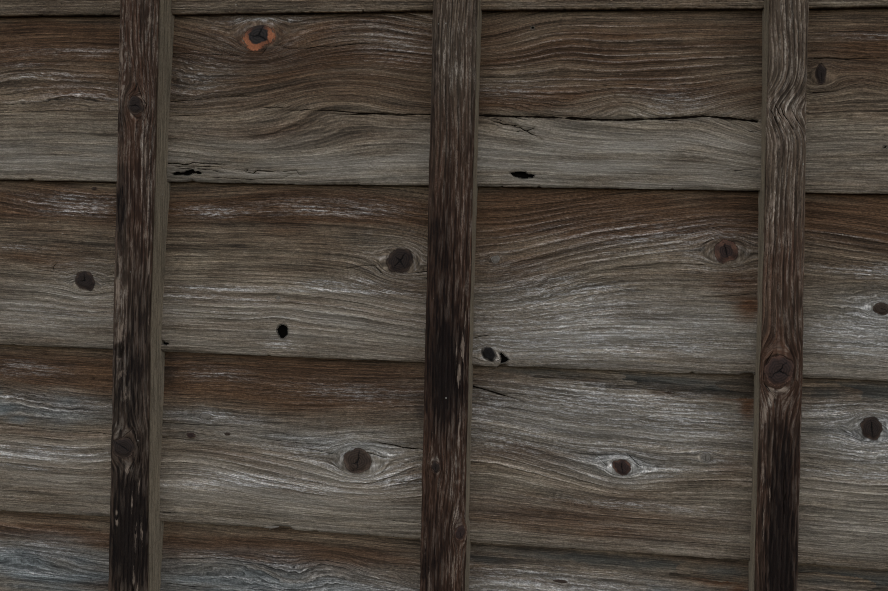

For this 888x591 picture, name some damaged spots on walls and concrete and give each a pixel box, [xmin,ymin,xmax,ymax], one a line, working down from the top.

crack [479,106,802,137]
crack [168,162,302,180]